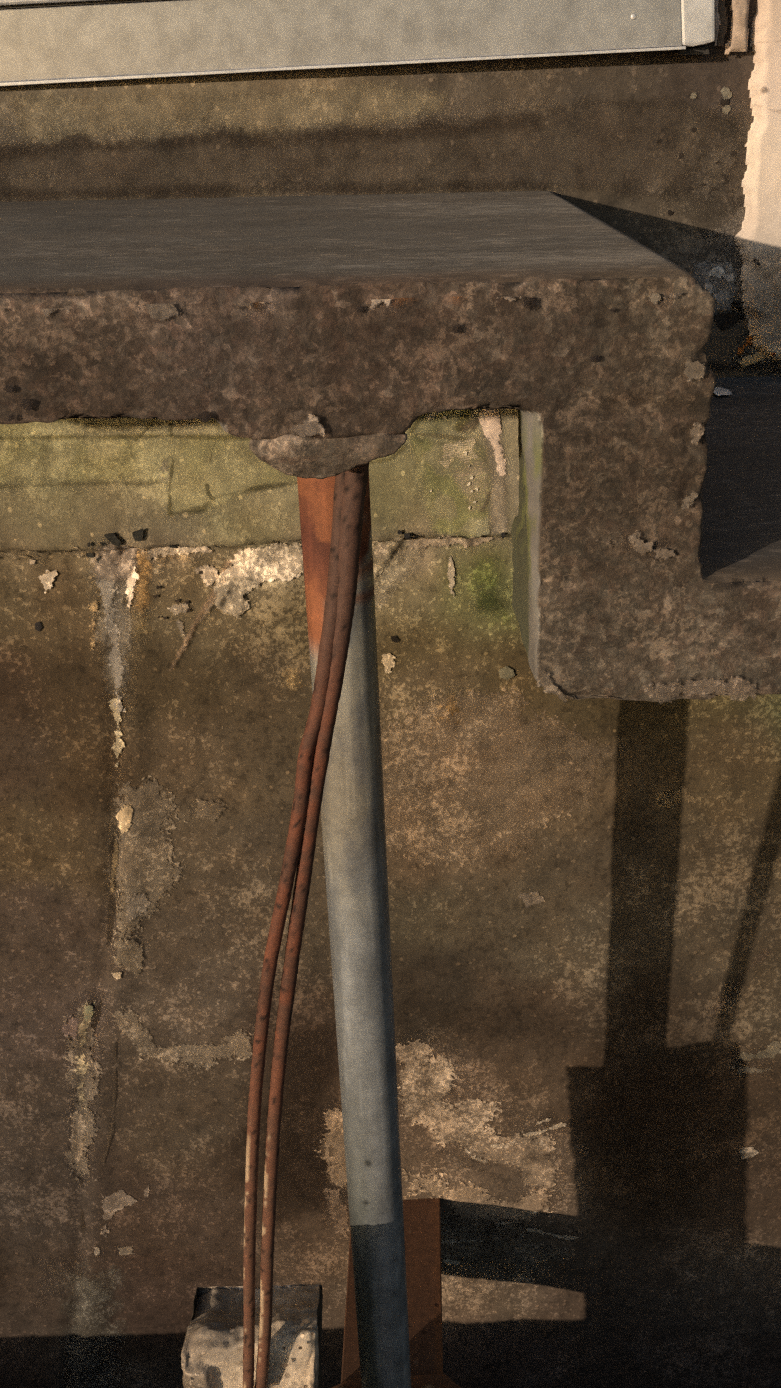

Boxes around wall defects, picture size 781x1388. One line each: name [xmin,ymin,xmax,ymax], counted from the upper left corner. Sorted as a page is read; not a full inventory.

leakage [0,83,747,206]
leakage [146,303,178,321]
leakage [370,299,391,308]
leakage [290,414,325,437]
spalling [0,528,304,619]
spalling [152,586,190,635]
rust [382,653,396,673]
spalling [243,409,508,1388]